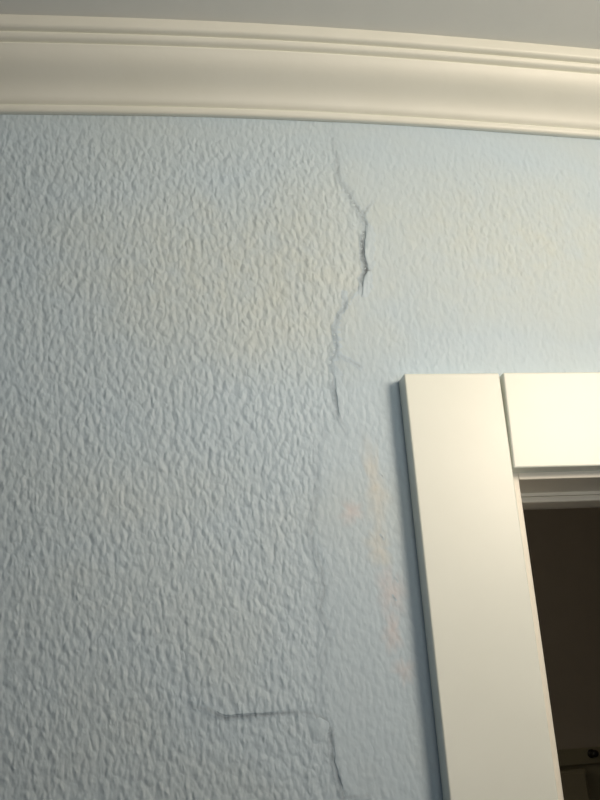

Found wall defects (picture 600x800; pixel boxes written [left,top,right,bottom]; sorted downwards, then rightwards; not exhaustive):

crack [328,137,377,435]
crack [183,701,373,800]